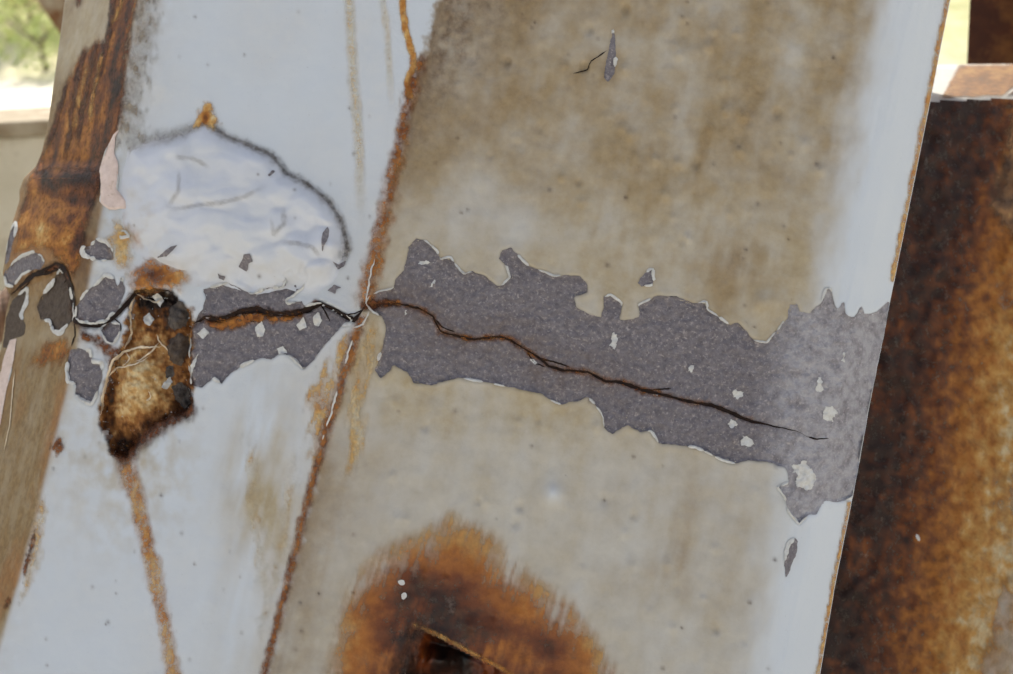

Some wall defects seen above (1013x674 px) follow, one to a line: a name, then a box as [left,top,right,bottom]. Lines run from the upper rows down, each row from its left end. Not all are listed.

rust [14,0,136,274]
crack [11,262,177,346]
spalling [3,221,353,456]
rust [262,0,424,674]
crack [193,298,829,440]
peeling [366,239,889,525]
rust [816,0,1013,674]
rust [120,442,179,674]
rust [335,516,605,674]
peeling [784,538,798,577]